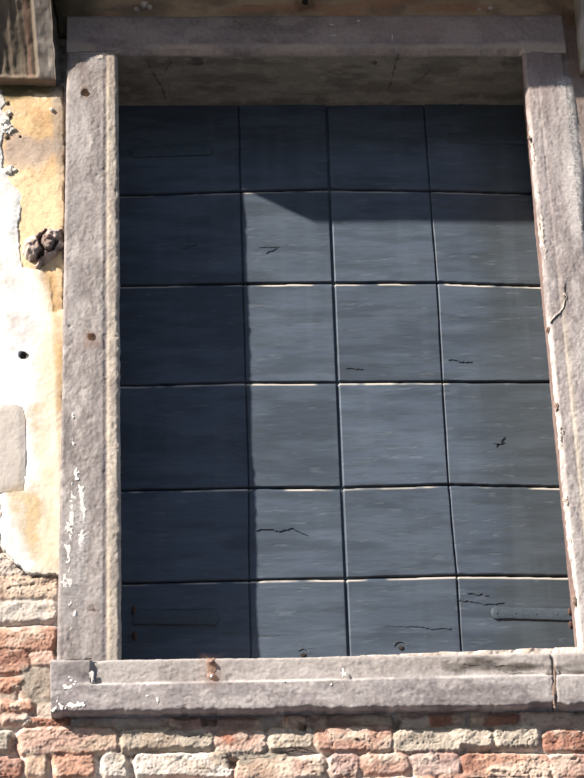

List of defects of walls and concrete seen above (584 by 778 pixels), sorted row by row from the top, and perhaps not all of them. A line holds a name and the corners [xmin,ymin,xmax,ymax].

peeling [0,85,66,312]
peeling [60,467,87,587]
crack [548,667,561,708]